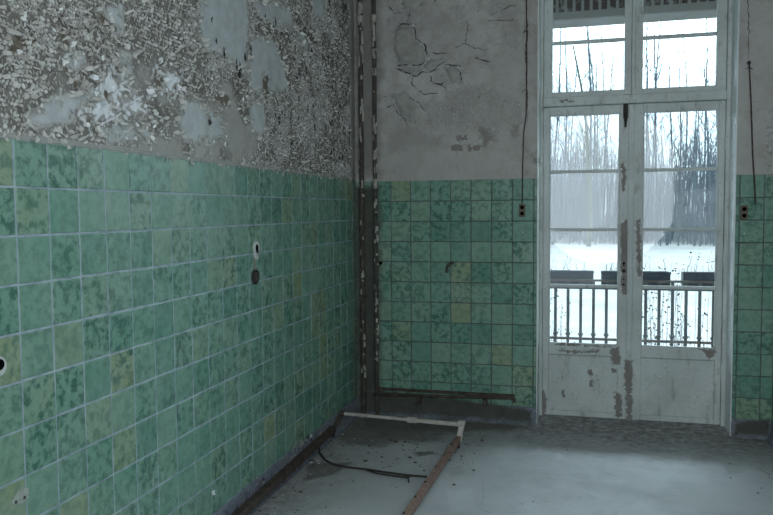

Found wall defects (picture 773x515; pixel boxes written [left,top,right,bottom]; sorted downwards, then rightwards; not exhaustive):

peeling [0,0,378,197]
crack [386,0,528,124]